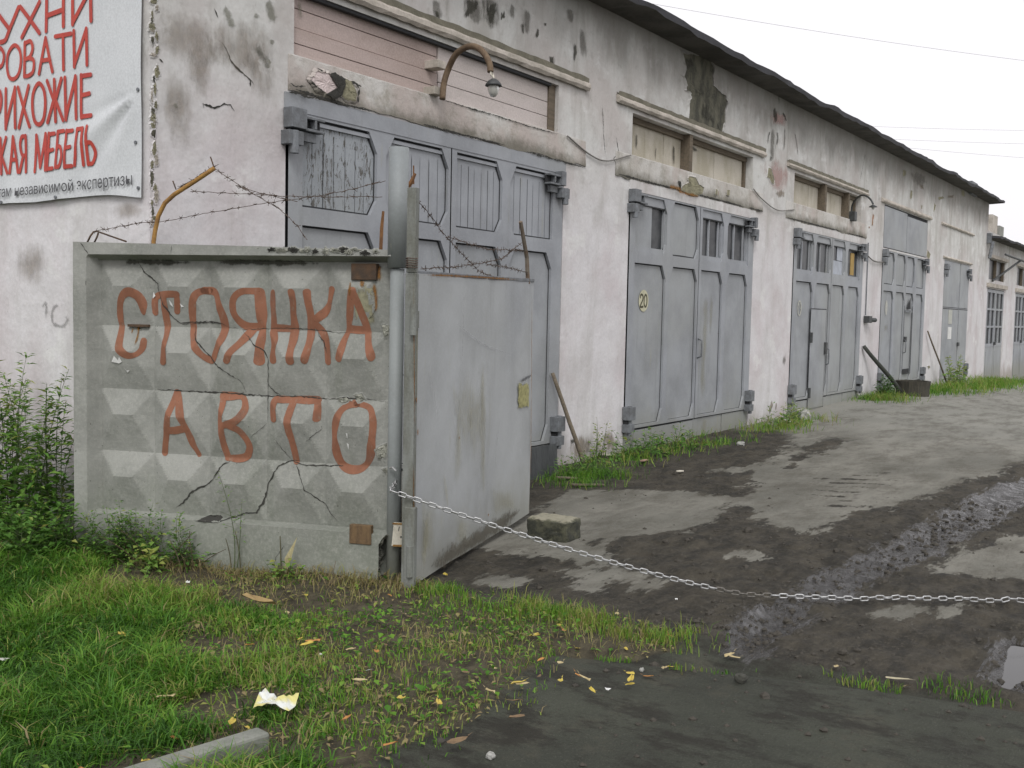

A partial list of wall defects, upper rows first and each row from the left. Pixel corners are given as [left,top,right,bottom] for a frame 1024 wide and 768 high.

crack [223,44,253,86]
spalling [326,72,358,104]
spalling [680,49,729,135]
crack [140,265,386,523]